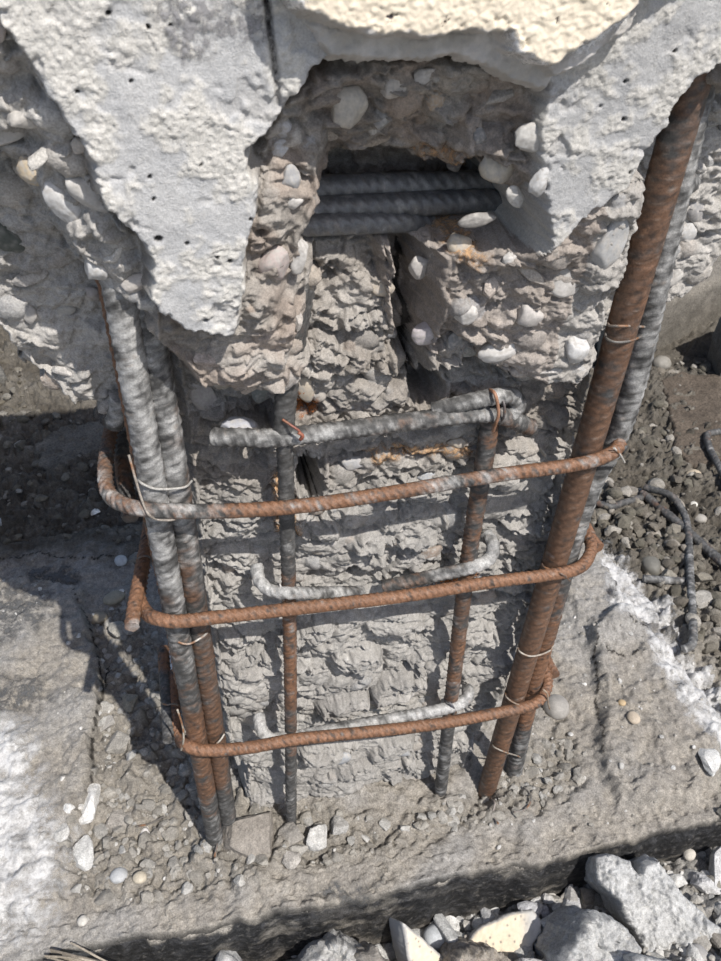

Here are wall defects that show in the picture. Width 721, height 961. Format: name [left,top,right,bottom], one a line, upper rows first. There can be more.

rust [432,214,485,267]
spalling [0,21,721,653]
rust [296,392,317,417]
rust [366,443,472,465]
crack [72,588,110,783]
spalling [165,625,226,744]
spalling [282,615,297,734]
spalling [434,592,472,797]
spalling [478,577,573,798]
damp [601,549,721,747]
spalling [190,755,236,850]
spalling [285,746,297,825]